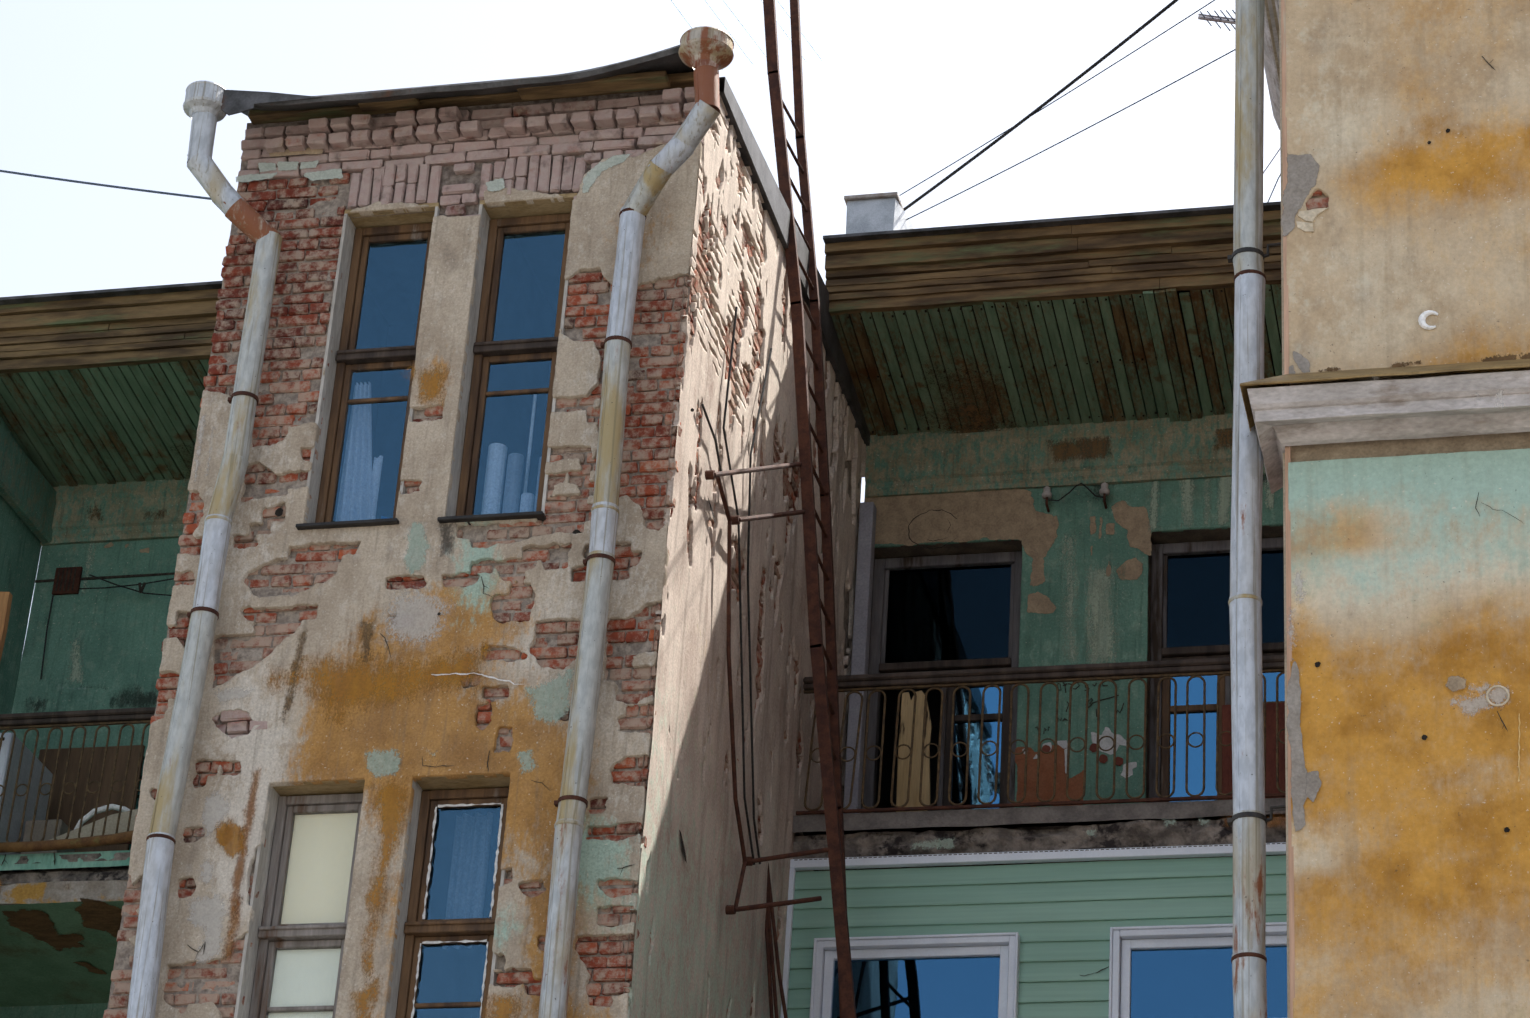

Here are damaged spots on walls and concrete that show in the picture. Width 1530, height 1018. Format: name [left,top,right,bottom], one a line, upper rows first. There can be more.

peeling [1281,154,1329,236]
flaking render [200,223,256,408]
flaking render [234,87,695,549]
flaking render [174,492,204,586]
water stain [202,793,229,836]
flaking render [212,710,267,739]
flaking render [213,545,359,688]
water stain [267,591,490,724]
flaking render [386,447,596,774]
peeling [1286,658,1322,831]
flaking render [0,868,143,1018]
flaking render [575,879,640,1007]